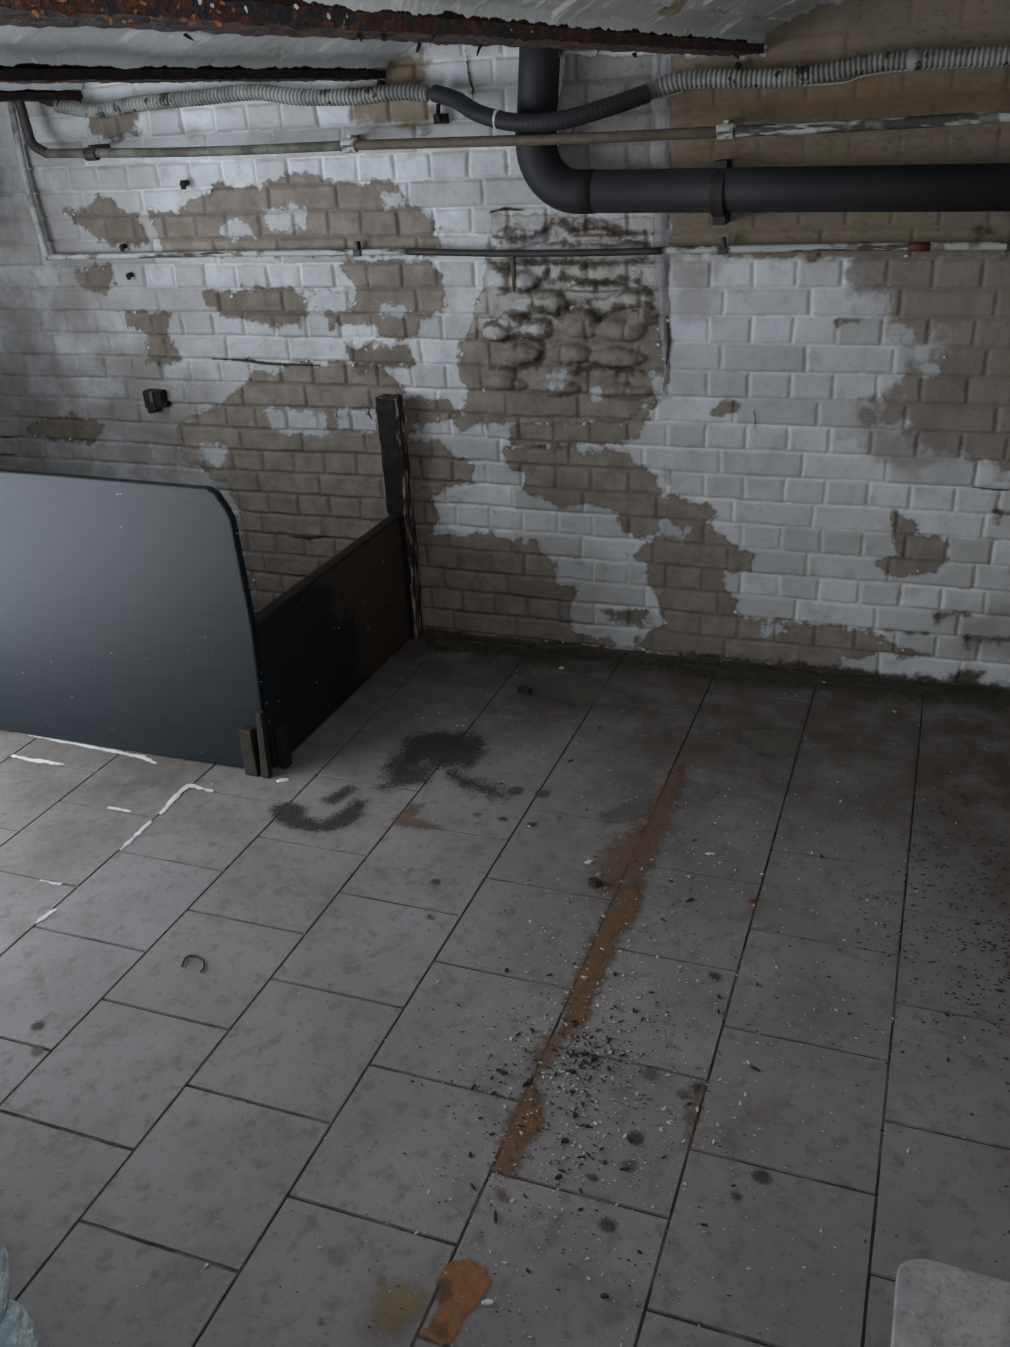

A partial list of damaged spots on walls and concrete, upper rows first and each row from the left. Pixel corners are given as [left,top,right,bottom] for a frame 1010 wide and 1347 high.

rust [92,0,162,26]
rust [177,0,236,41]
rust [342,13,387,42]
peeling [63,171,930,667]
peeling [875,511,950,577]
rust [489,766,684,1200]
rust [422,1259,491,1345]